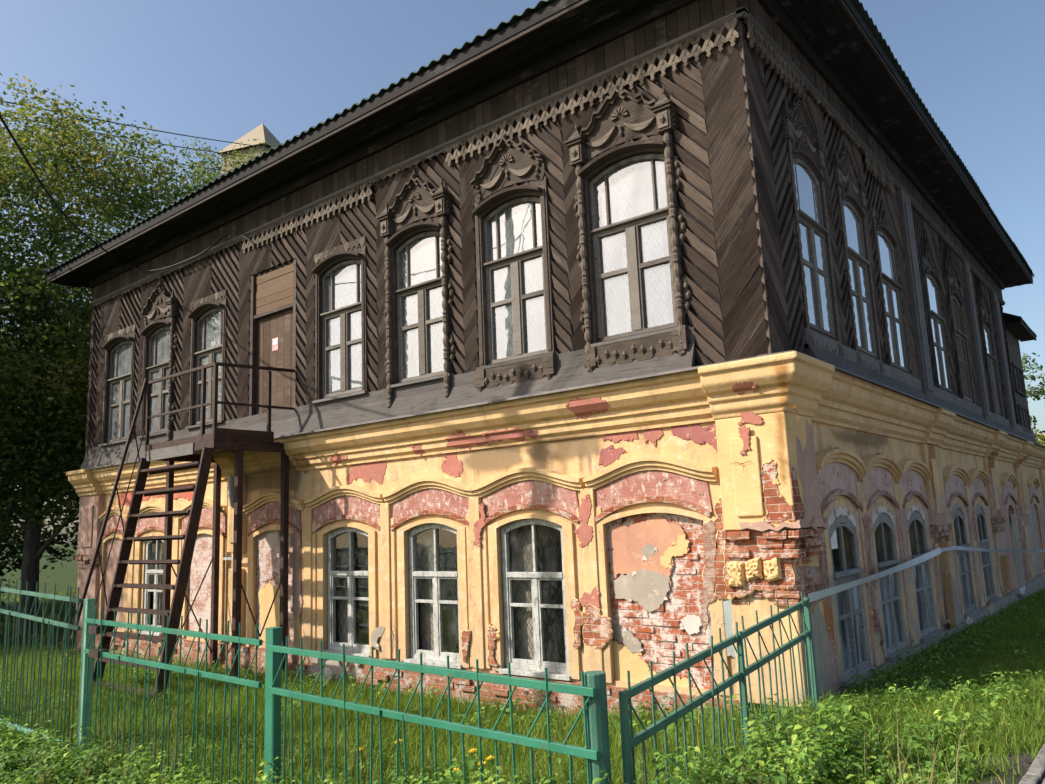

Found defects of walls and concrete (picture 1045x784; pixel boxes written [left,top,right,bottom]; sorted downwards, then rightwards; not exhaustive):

peeling [565,396,609,419]
peeling [738,411,764,455]
peeling [944,474,986,506]
peeling [249,455,387,642]
flaking render [393,419,926,705]